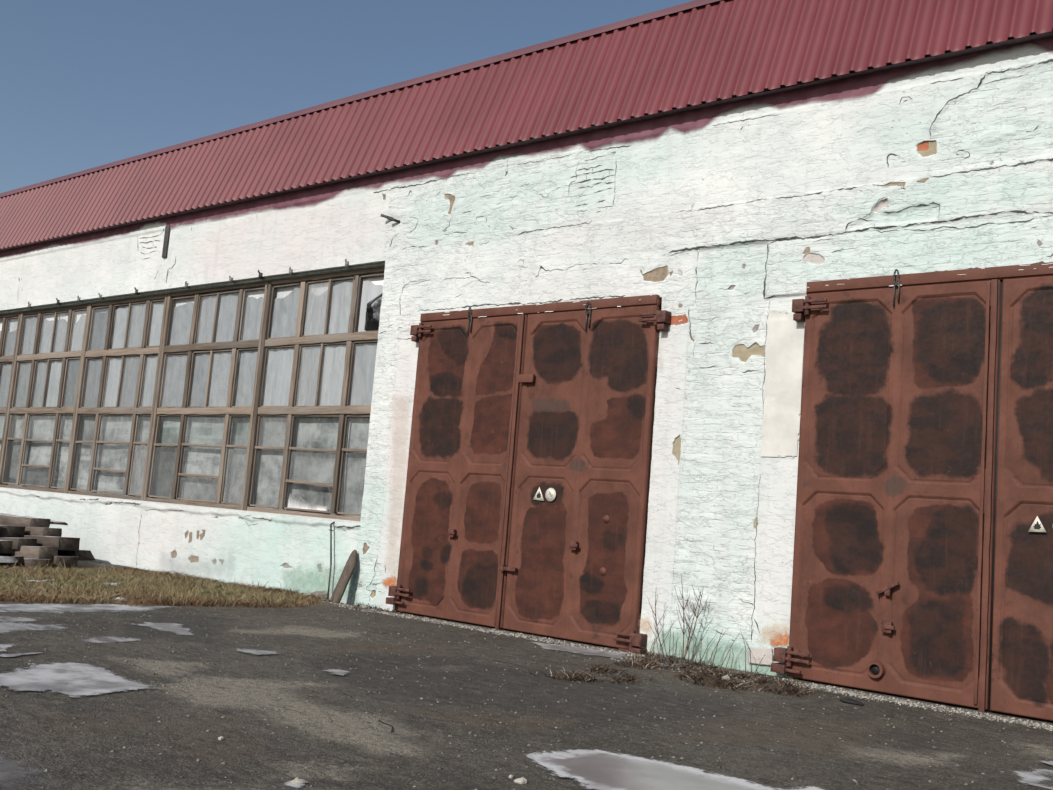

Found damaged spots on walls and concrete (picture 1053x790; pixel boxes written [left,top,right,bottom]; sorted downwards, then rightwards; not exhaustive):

crack [899,59,1053,138]
flaking render [914,139,939,159]
crack [932,154,1053,177]
crack [373,145,631,249]
crack [681,187,856,212]
flaking render [639,265,682,300]
peeling [731,324,767,364]
peeling [170,529,205,563]